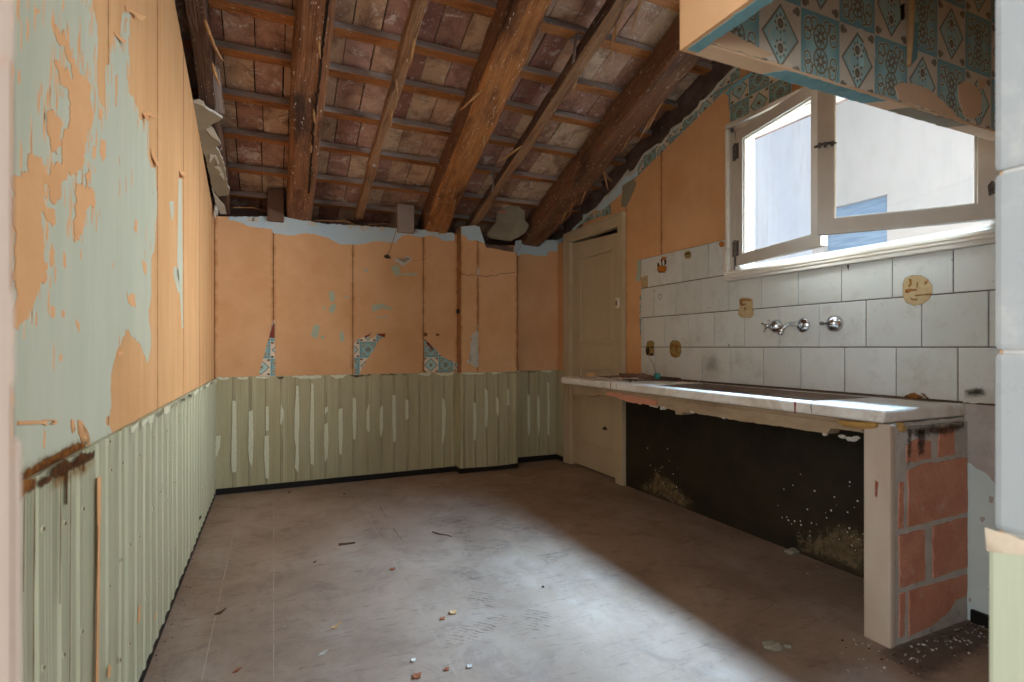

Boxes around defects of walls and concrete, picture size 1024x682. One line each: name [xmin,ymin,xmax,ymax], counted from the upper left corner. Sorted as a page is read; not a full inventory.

peeling [895,78,986,121]
peeling [13,0,187,474]
rust [22,443,95,504]
peeling [216,382,409,479]
peeling [95,477,111,682]